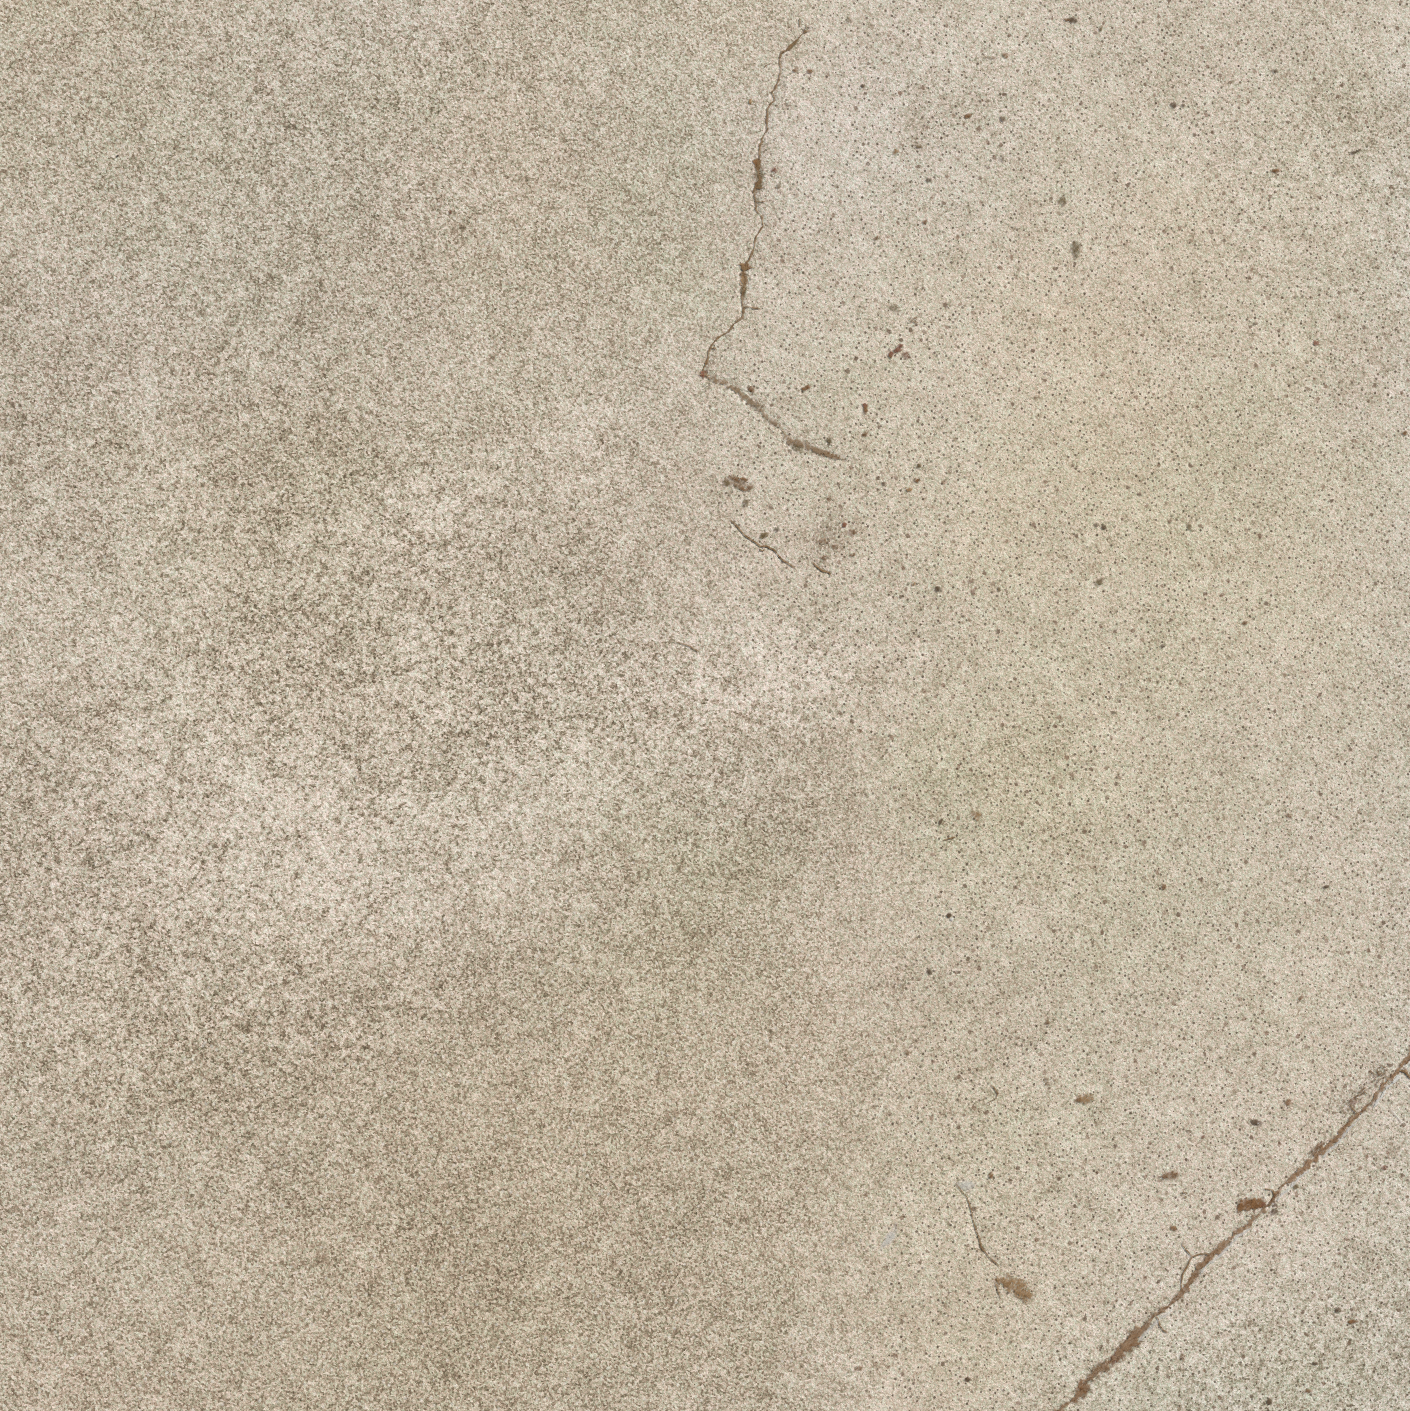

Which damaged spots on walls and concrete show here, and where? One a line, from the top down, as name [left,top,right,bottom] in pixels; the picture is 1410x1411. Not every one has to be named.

crack [699,19,843,460]
crack [956,1184,1001,1299]
crack [1054,1049,1410,1411]